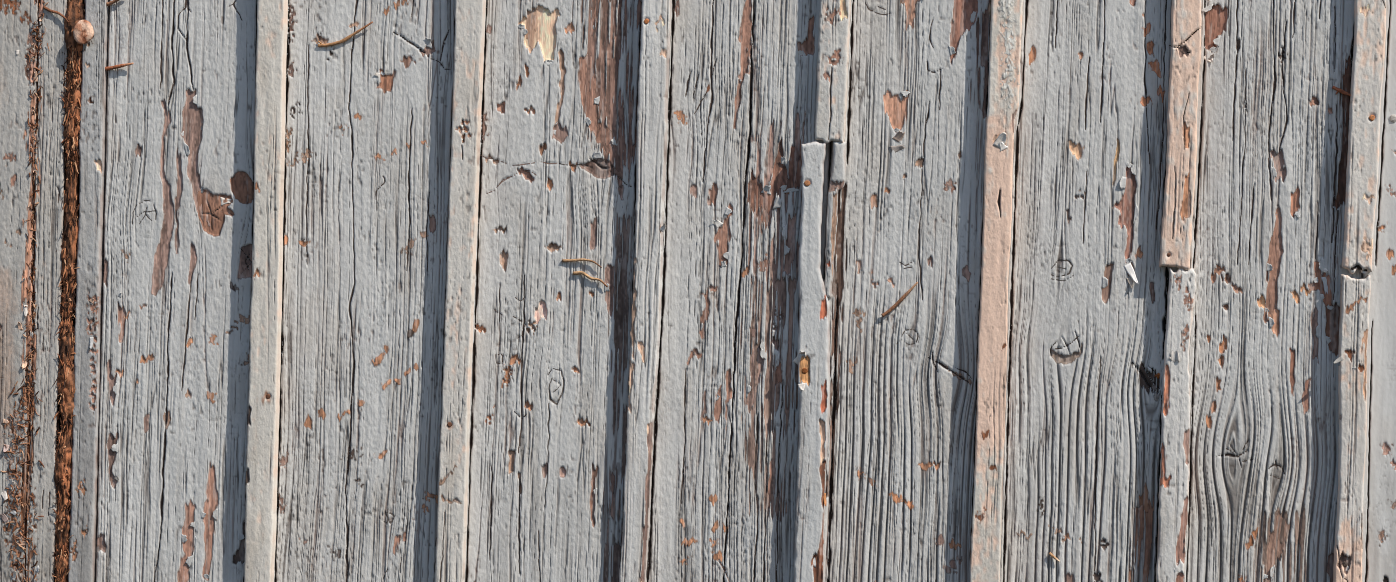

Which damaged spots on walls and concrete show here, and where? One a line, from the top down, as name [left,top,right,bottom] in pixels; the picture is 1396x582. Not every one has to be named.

peeling [949,0,991,118]
peeling [883,90,910,153]
peeling [87,89,234,410]
peeling [500,250,508,271]
peeling [516,0,679,582]
peeling [687,0,806,521]
peeling [1102,139,1155,303]
peeling [70,529,106,561]
peeling [177,462,218,582]
peeling [508,451,522,494]
peeling [1259,504,1306,582]
peeling [1326,552,1351,582]